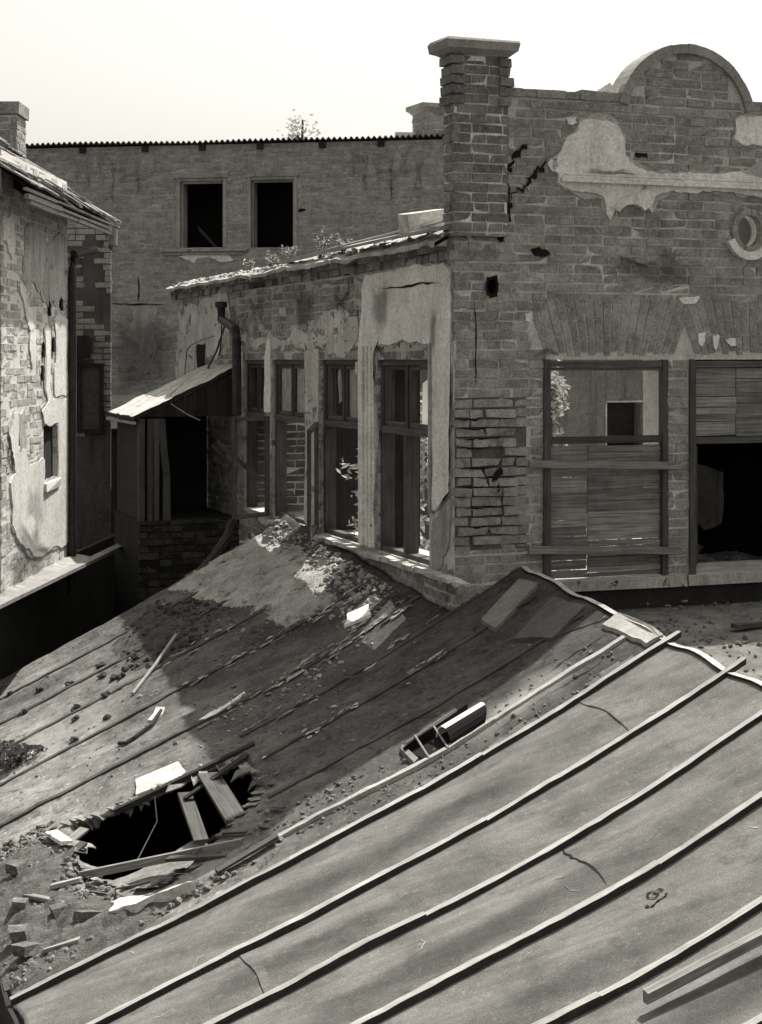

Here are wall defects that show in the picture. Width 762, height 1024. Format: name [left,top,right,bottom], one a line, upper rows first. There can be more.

crack [507,144,547,223]
peeling [547,113,762,221]
crack [383,281,434,289]
spalling [486,275,499,299]
spalling [531,247,551,257]
peeling [2,214,68,558]
peeling [175,258,455,570]
crack [439,304,477,509]
crack [496,617,610,731]
crack [562,849,608,886]